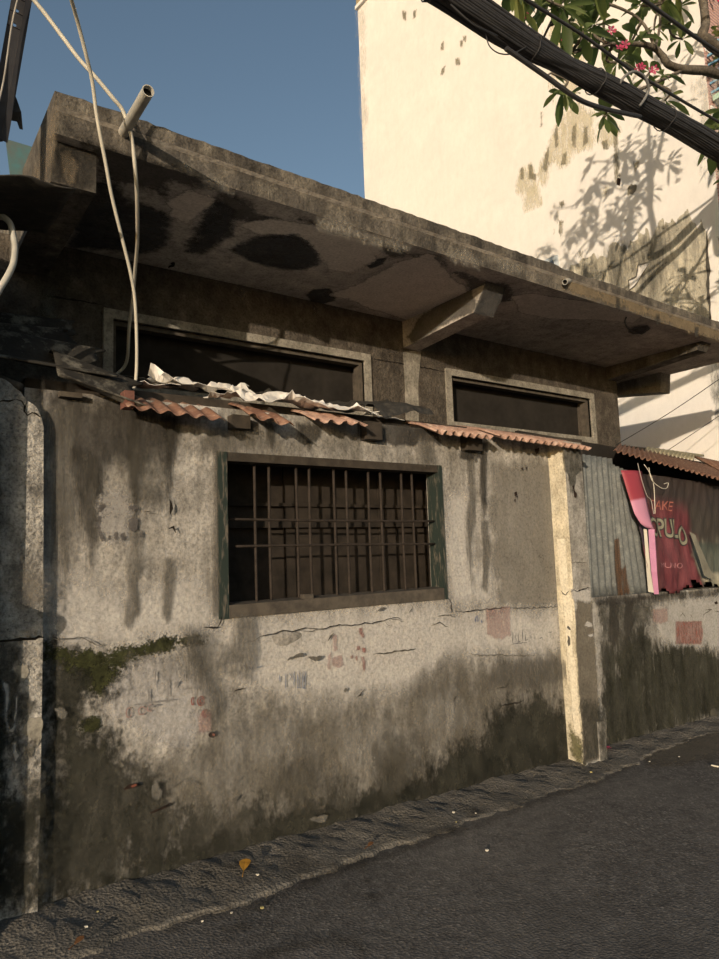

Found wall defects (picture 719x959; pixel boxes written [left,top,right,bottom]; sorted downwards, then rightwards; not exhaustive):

water stain [71,137,320,270]
peeling [518,103,618,211]
water stain [562,282,719,342]
peeling [569,209,719,319]
water stain [44,406,103,572]
water stain [128,408,141,518]
water stain [125,531,143,626]
water stain [164,559,173,620]
crack [257,604,414,639]
crack [431,587,589,627]
water stain [576,589,719,767]
water stain [0,636,568,913]